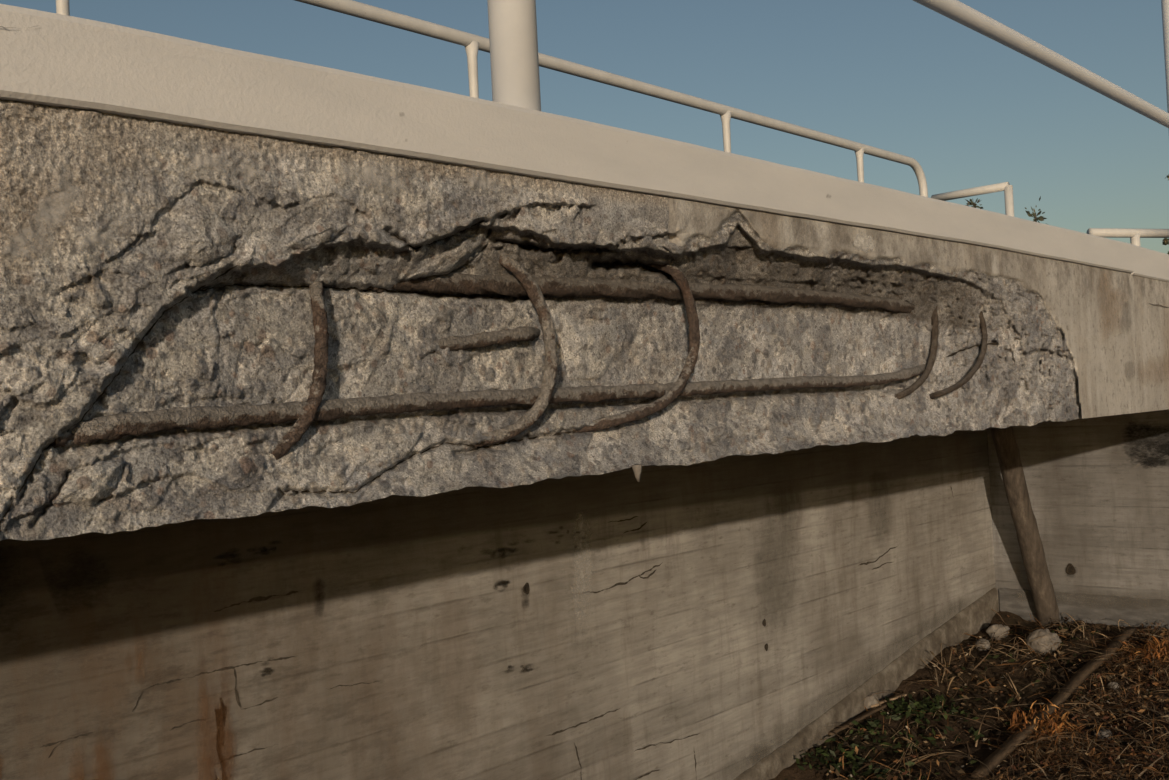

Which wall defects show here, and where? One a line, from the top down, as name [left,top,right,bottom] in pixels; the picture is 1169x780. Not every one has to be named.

crack [387,220,666,273]
crack [0,258,429,523]
spalling [0,182,1082,541]
crack [285,430,578,493]
water stain [1126,422,1169,466]
crack [575,562,663,594]
crack [132,656,294,712]
crack [546,708,620,780]